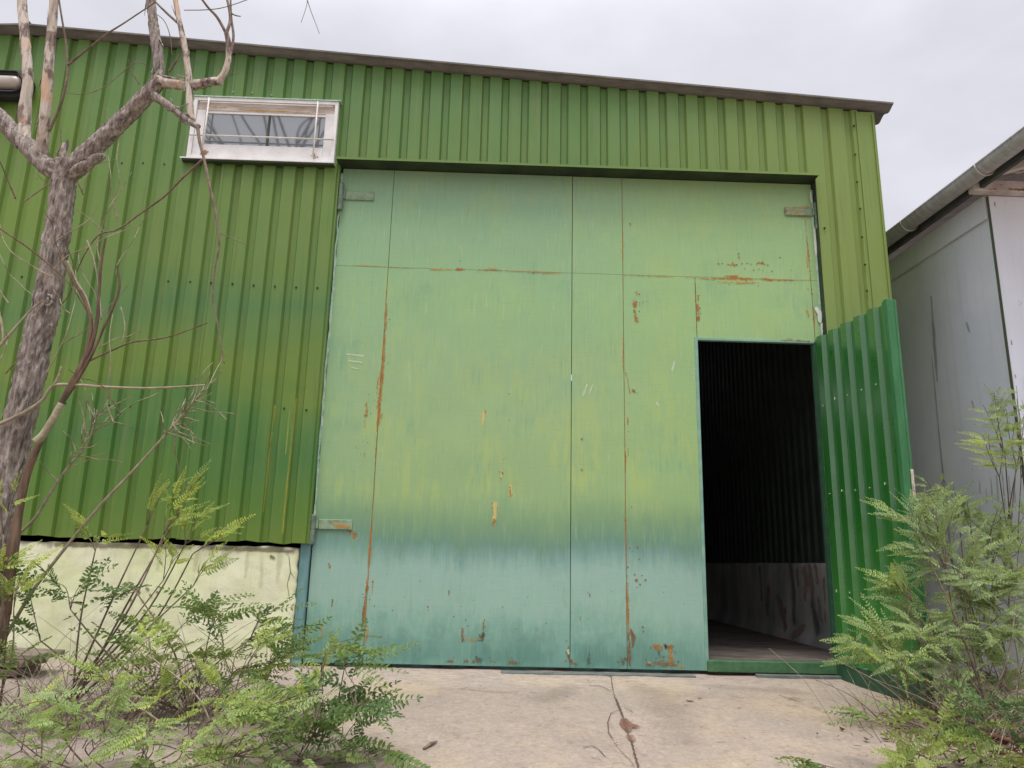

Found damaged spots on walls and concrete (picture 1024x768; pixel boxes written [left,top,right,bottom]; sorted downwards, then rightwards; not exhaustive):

corrosion [687,253,793,325]
corrosion [355,281,390,458]
corrosion [622,291,647,432]
corrosion [330,471,375,644]
corrosion [617,451,646,666]
crack [586,677,639,768]
corrosion [645,644,684,668]